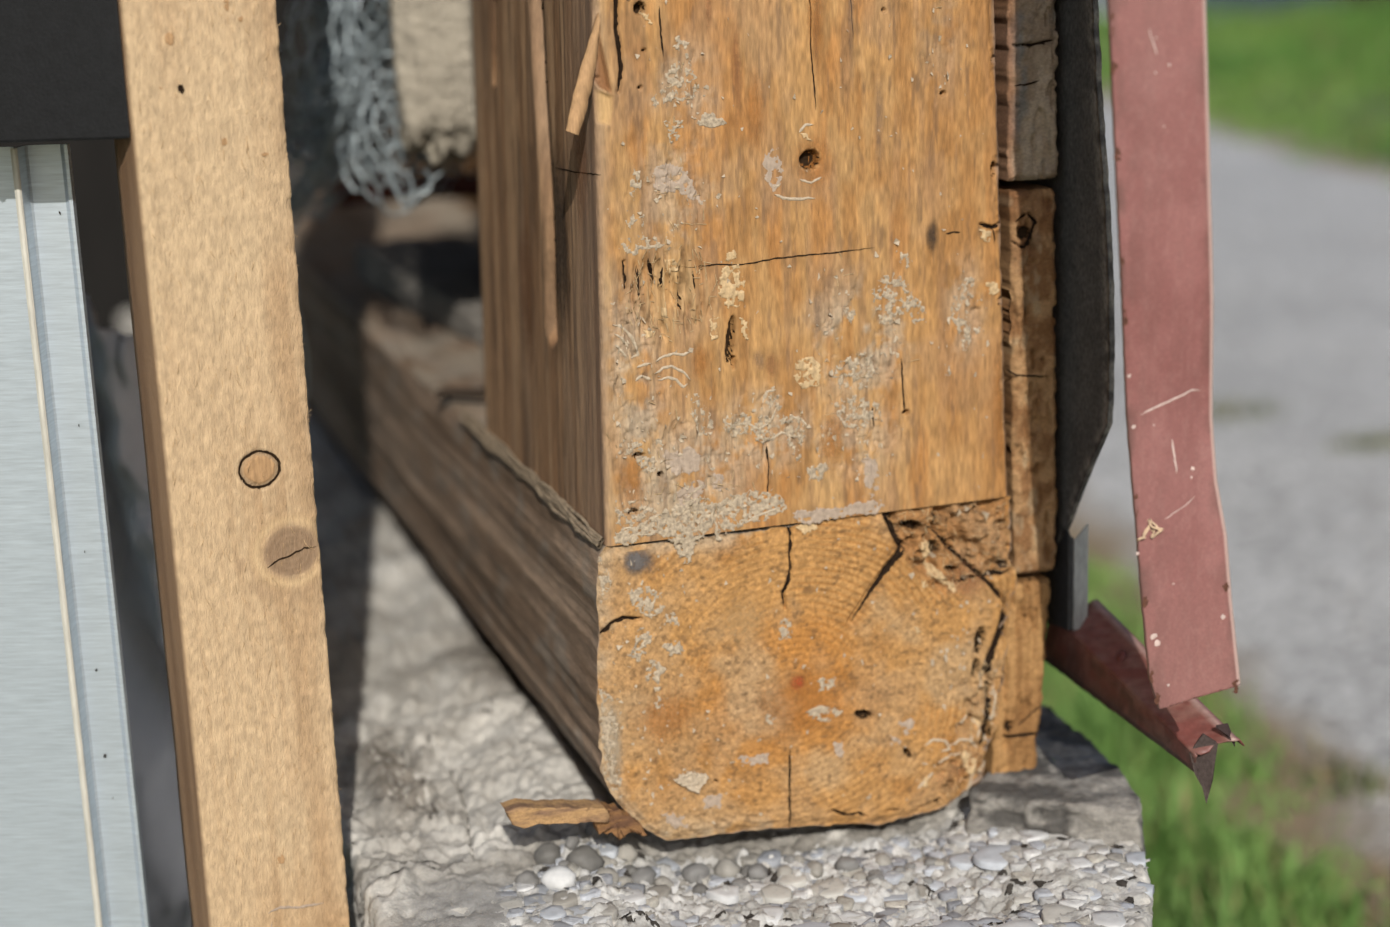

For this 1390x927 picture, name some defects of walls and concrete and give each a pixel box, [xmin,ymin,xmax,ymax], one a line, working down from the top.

crack [622,247,875,297]
water stain [928,225,936,248]
crack [781,524,792,607]
crack [851,511,1042,747]
crack [785,750,793,827]